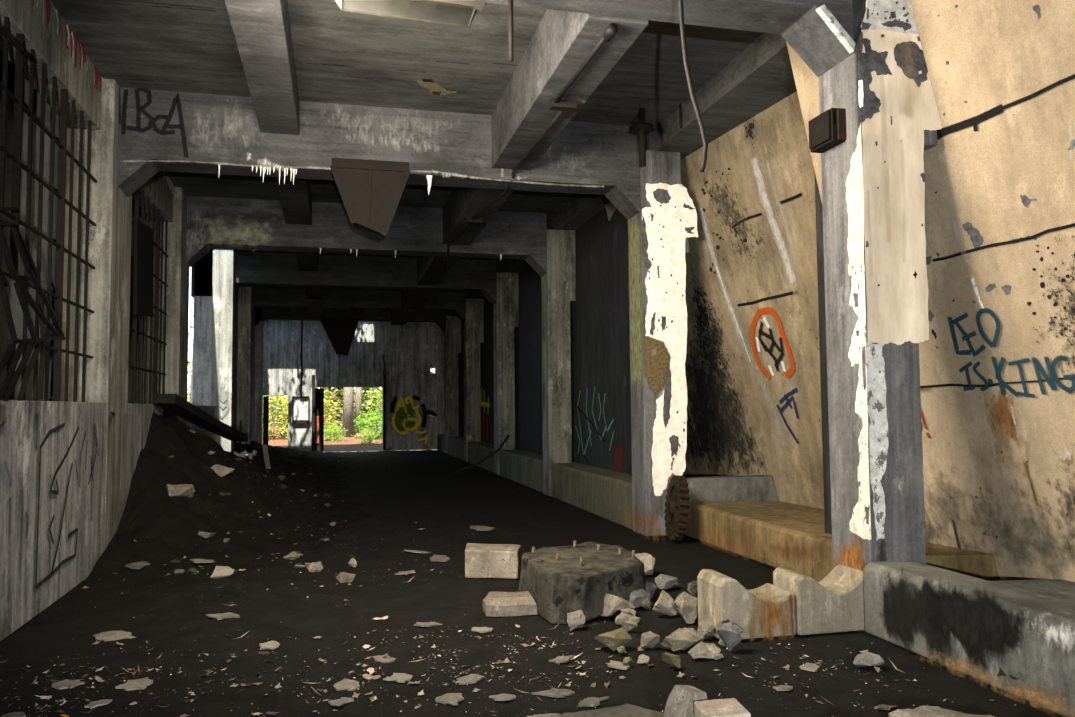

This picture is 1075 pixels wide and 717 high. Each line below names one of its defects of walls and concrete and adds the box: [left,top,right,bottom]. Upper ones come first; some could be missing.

peeling [858,0,928,125]
peeling [642,188,695,297]
damp [751,158,796,283]
peeling [963,222,983,248]
damp [685,168,787,474]
mould [1027,245,1075,371]
spalling [644,312,686,470]
rust [994,391,1015,438]